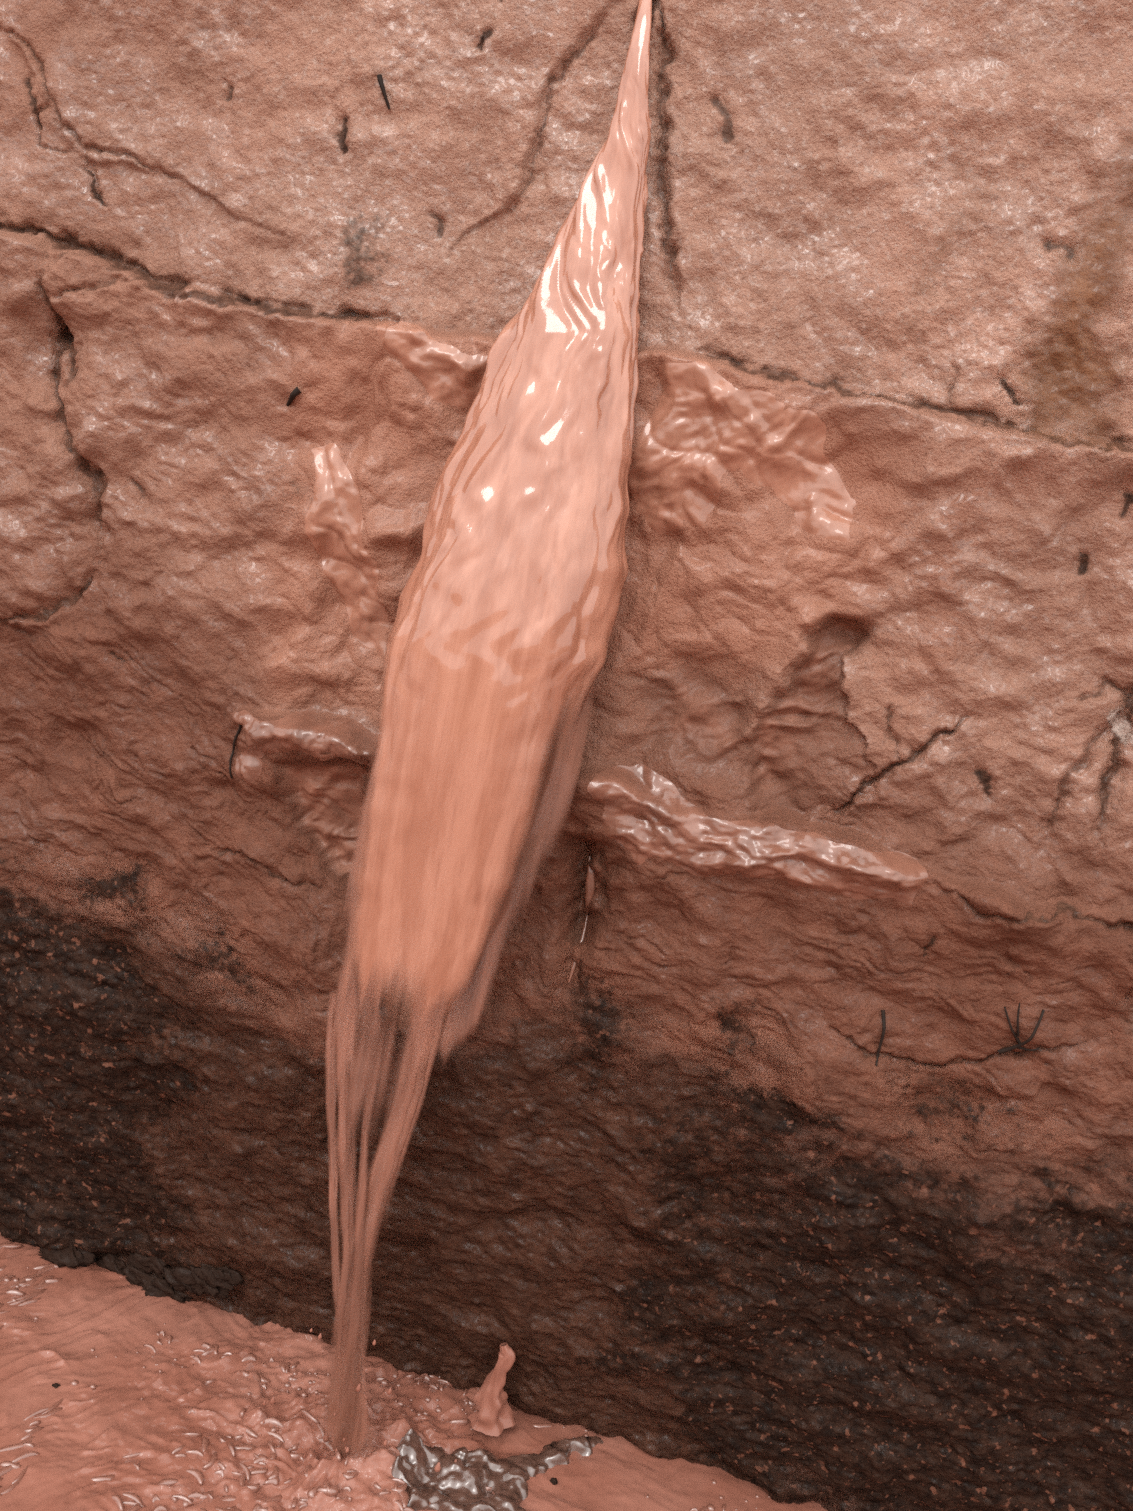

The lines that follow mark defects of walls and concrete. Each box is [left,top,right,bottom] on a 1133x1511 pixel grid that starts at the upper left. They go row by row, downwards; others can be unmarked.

crack [652,0,675,255]
crack [0,225,367,513]
crack [709,355,1133,451]
crack [0,579,91,624]
crack [836,715,954,812]
crack [1049,681,1133,823]
water stain [0,863,400,1346]
water stain [365,964,1133,1511]